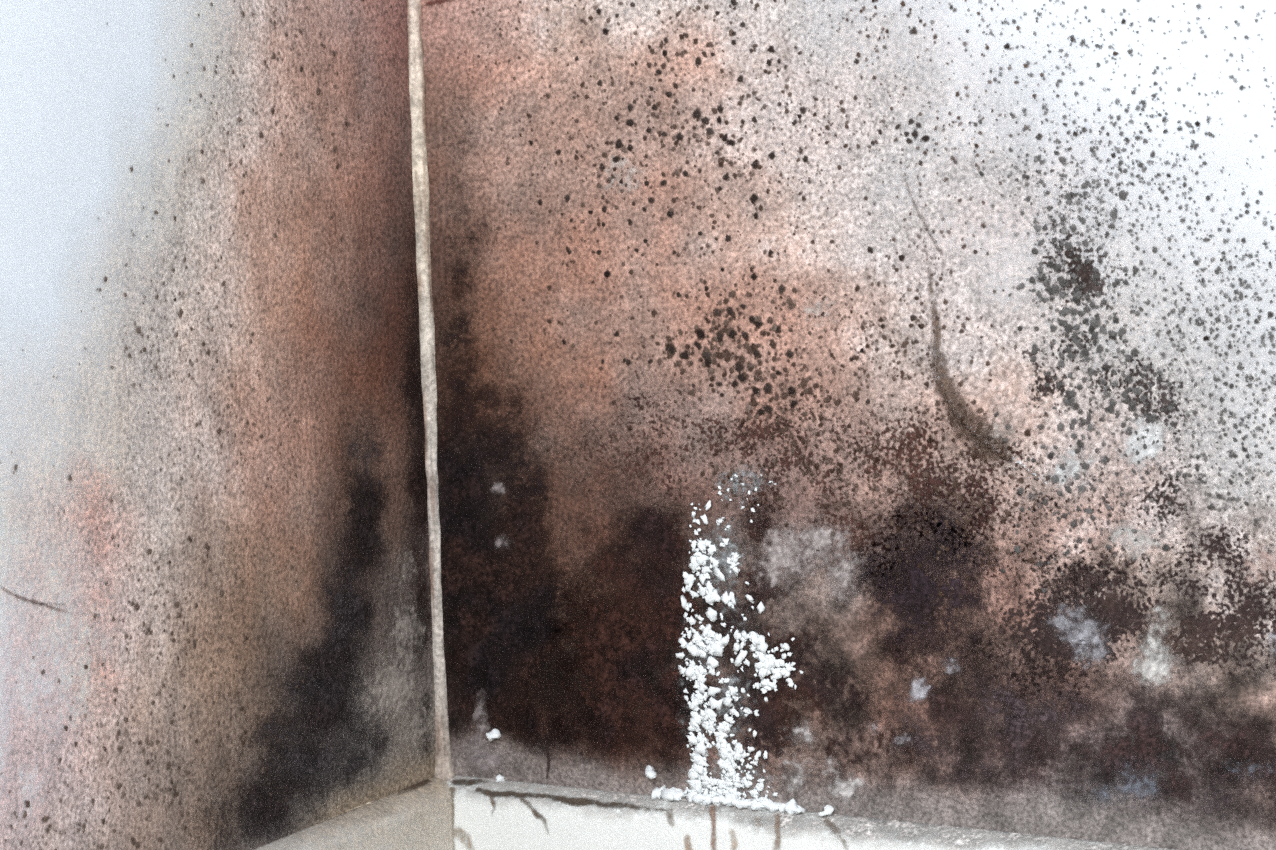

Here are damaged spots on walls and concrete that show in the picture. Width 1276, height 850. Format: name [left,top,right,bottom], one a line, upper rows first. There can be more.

leakage [965,0,1143,97]
leakage [1224,5,1276,127]
leakage [1014,61,1054,124]
leakage [1135,81,1168,122]
leakage [1177,104,1210,133]
leakage [1160,140,1207,175]
leakage [1128,192,1160,253]
leakage [1181,245,1215,290]
leakage [1235,240,1276,271]
leakage [1252,327,1275,354]
crack [452,750,665,824]